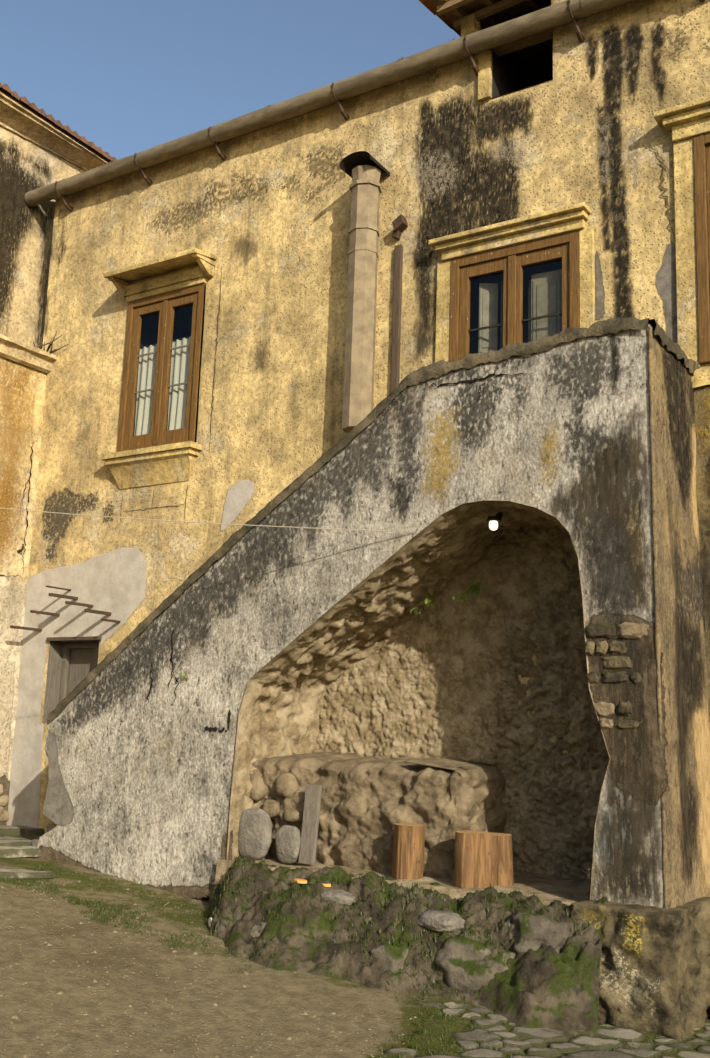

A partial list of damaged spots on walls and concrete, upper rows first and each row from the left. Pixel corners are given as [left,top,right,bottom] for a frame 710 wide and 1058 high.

damp [0,140,65,341]
damp [414,96,533,355]
damp [587,22,666,318]
crack [643,140,674,235]
crack [0,434,33,577]
damp [60,353,534,739]
crack [420,373,525,402]
damp [544,333,661,904]
damp [663,351,710,880]